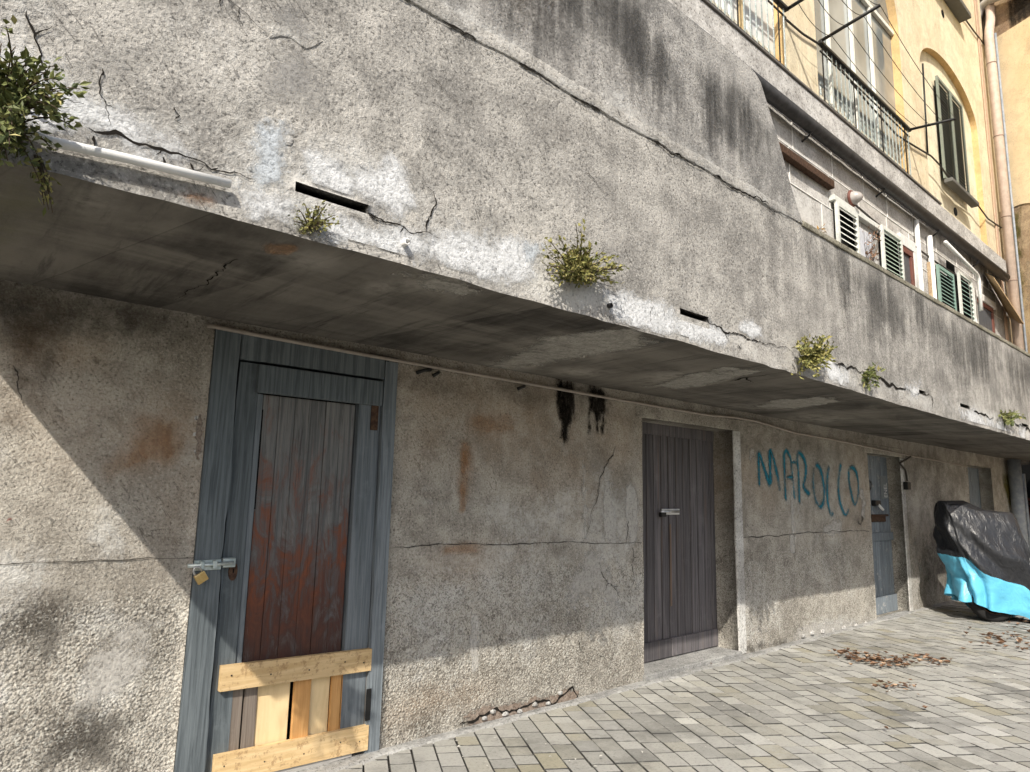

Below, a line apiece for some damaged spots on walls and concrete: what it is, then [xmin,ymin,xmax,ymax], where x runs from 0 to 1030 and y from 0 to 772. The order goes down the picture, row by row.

leakage [596,0,667,76]
crack [25,11,251,179]
leakage [489,290,727,368]
leakage [739,319,761,338]
leakage [643,367,765,389]
crack [826,362,933,407]
leakage [557,379,575,441]
leakage [588,386,606,434]
crack [974,410,1030,431]
crack [393,446,641,614]
crack [0,557,188,565]
spalling [460,686,579,726]